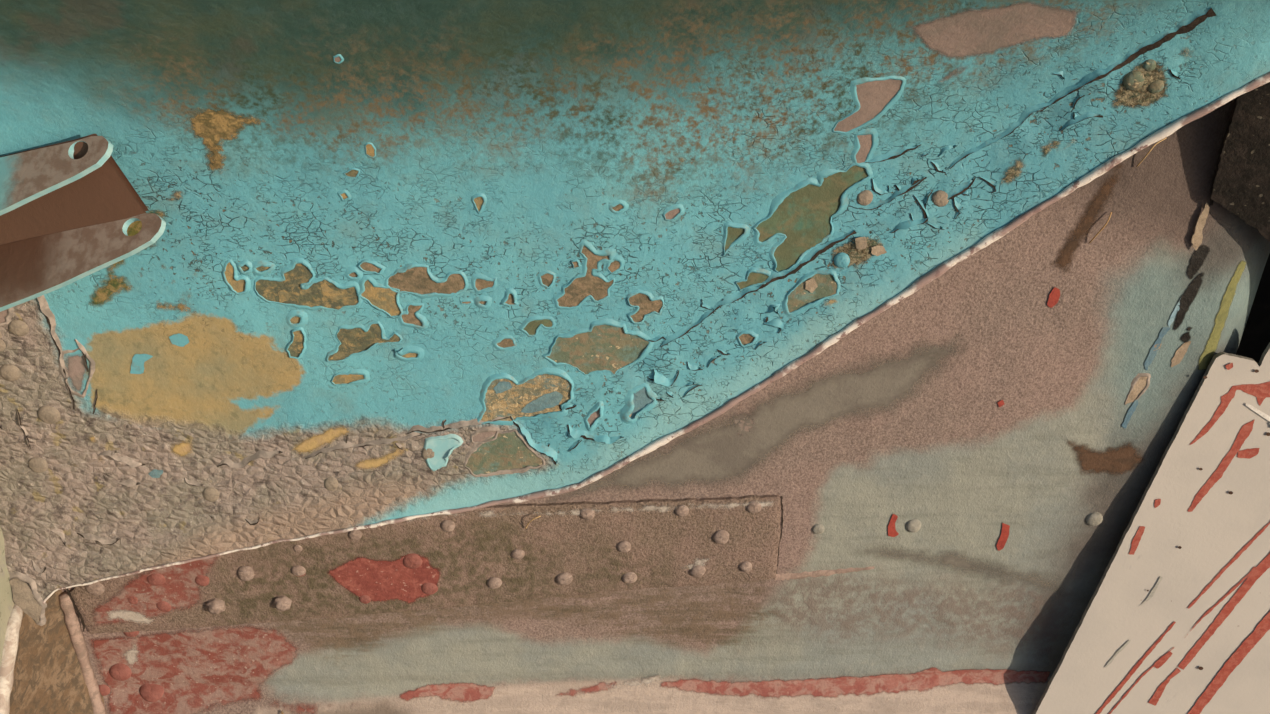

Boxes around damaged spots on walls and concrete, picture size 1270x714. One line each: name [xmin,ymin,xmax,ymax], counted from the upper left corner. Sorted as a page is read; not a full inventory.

peeling [913,2,1077,80]
peeling [722,76,906,317]
crack [646,7,1217,401]
corrosion [1056,165,1120,271]
corrosion [157,303,190,312]
peeling [221,258,519,385]
peeling [424,239,664,477]
leakage [574,346,956,494]
peeling [91,557,317,714]
peeling [328,555,440,603]
peeling [400,683,495,702]
peeling [558,668,1050,698]